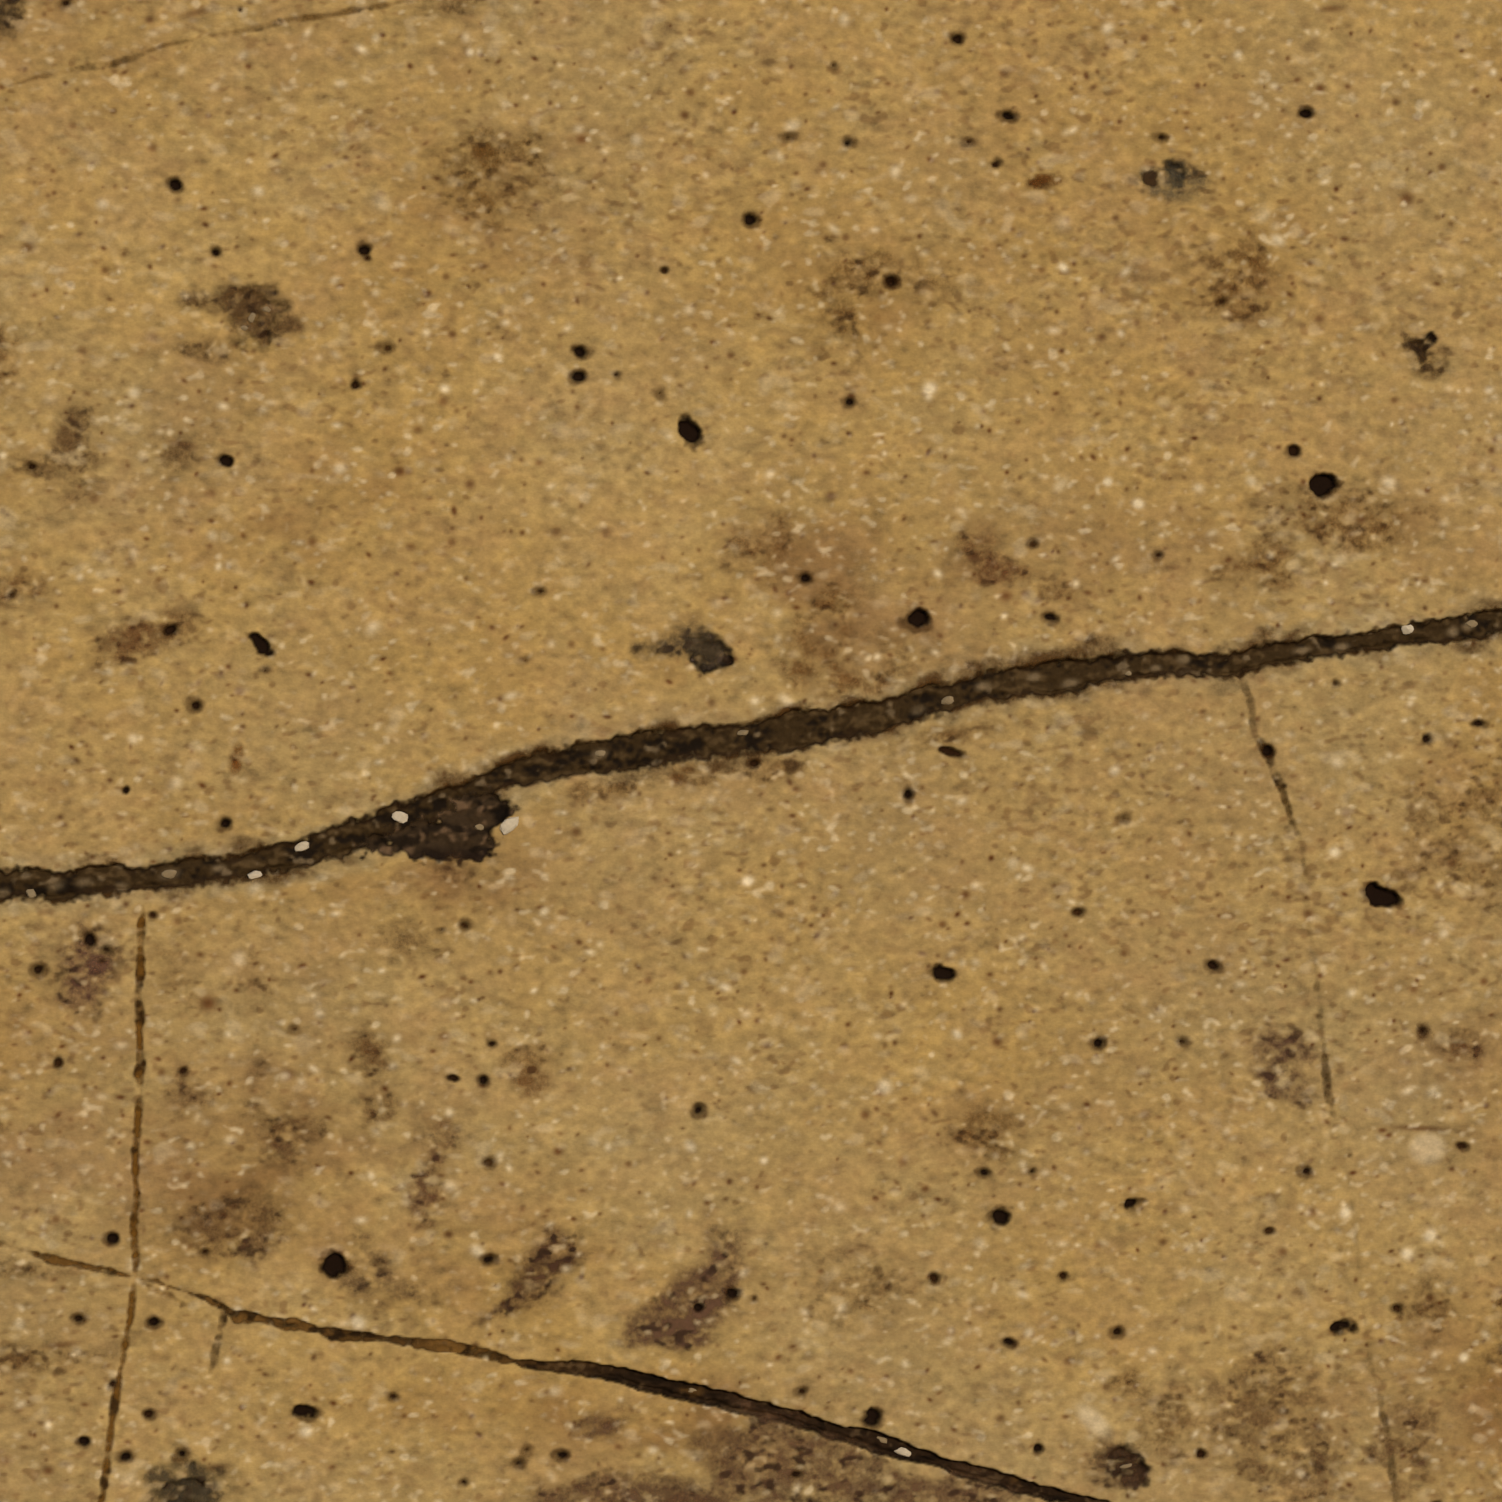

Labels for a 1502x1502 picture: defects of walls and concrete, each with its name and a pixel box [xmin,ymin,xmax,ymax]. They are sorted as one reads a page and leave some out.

crack [0,603,1502,1502]